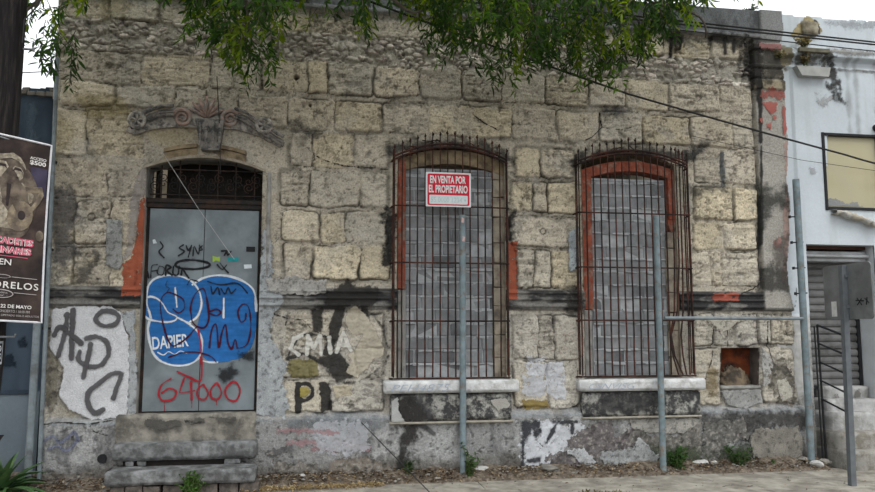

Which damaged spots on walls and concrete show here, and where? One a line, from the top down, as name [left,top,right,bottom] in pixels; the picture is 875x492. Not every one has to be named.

peeling [106,160,146,297]
peeling [760,86,790,278]
leakage [754,45,875,294]
flaking render [45,305,138,420]
spalling [144,416,236,430]
leakage [396,394,437,470]
flaking render [518,348,805,467]